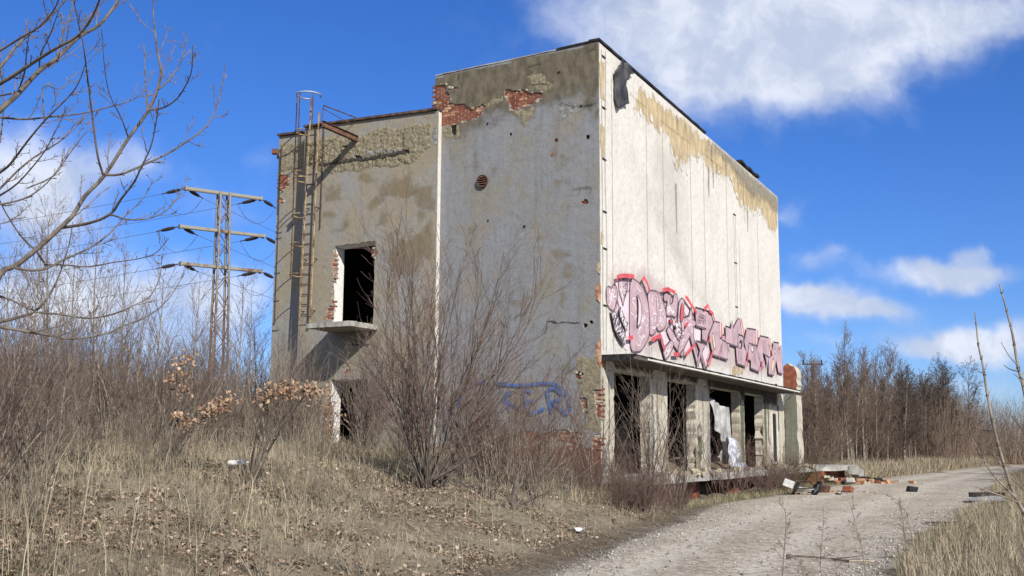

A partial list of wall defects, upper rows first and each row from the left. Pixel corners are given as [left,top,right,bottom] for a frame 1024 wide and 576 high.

spalling [276,71,560,205]
peeling [635,86,777,237]
flaking render [322,247,339,321]
flaking render [506,339,610,472]